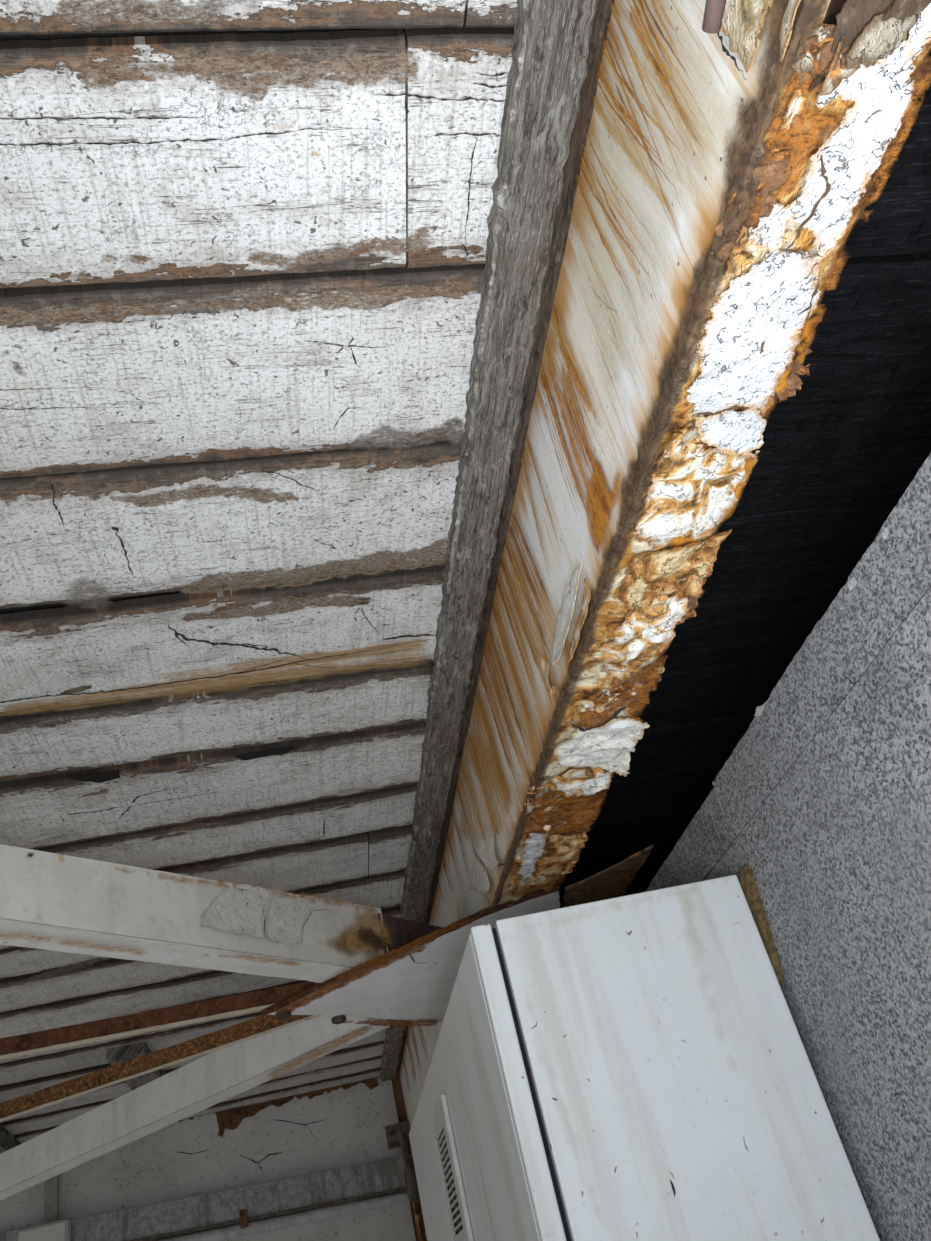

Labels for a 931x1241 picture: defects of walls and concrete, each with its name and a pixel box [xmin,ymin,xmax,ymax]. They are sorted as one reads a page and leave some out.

peeling [57,0,223,29]
peeling [79,50,420,101]
corrosion [865,59,931,216]
peeling [249,228,432,270]
peeling [0,284,467,328]
corrosion [261,0,861,1019]
corrosion [1,640,424,714]
crack [0,609,434,703]
peeling [546,717,650,797]
peeling [517,830,588,882]
corrosion [269,1020,437,1097]
corrosion [170,1077,379,1138]